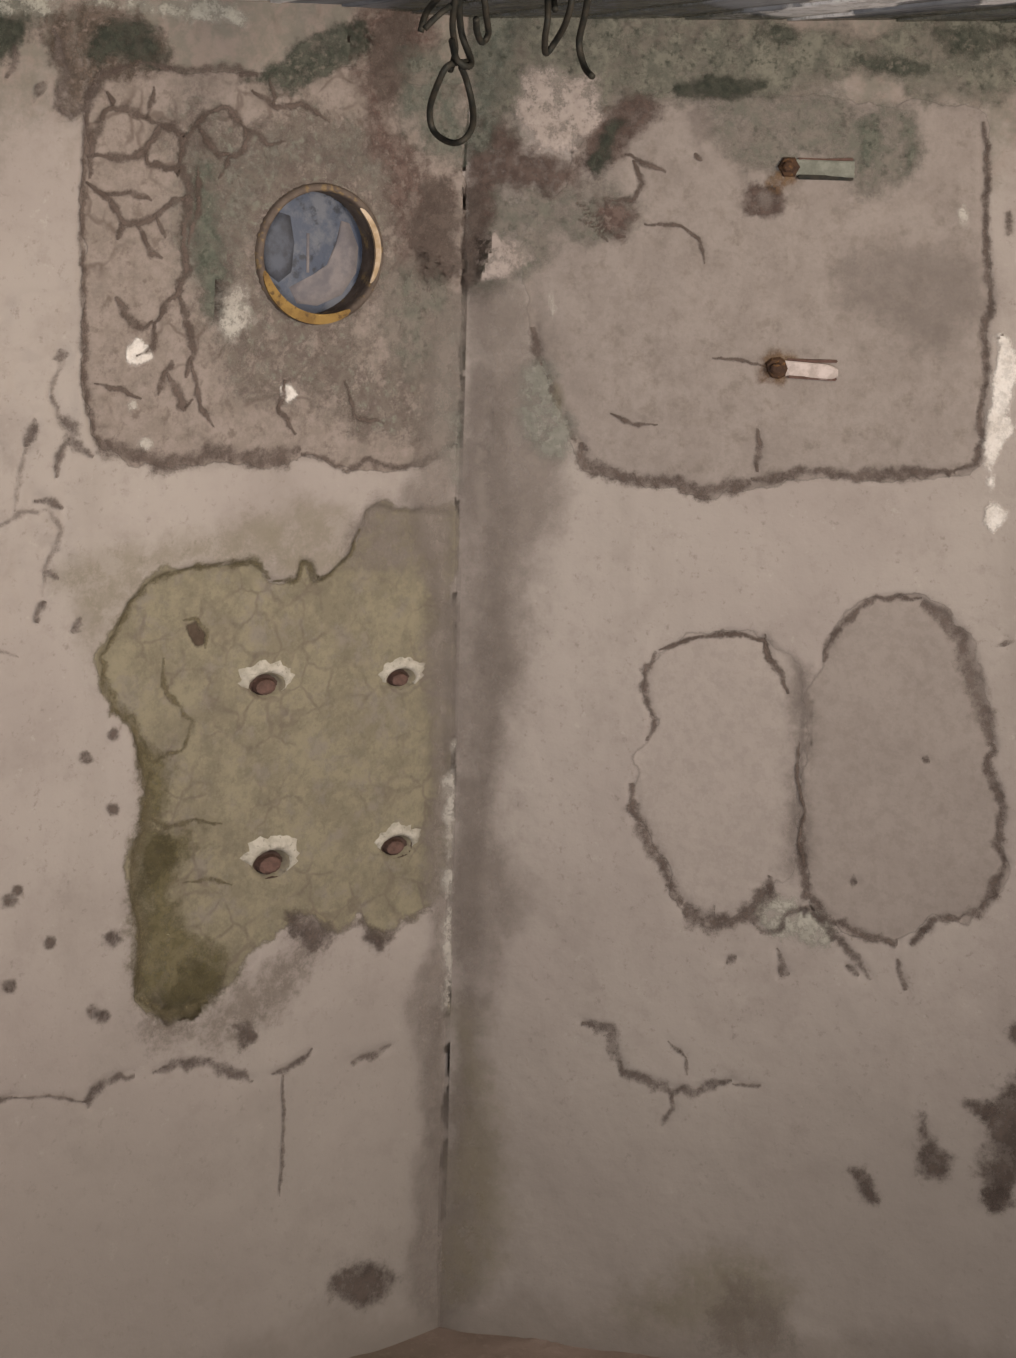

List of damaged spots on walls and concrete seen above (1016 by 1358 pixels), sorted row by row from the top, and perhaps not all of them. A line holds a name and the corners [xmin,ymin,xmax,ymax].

crack [6,28,327,435]
spalling [744,185,785,216]
crack [8,348,94,623]
leakage [160,0,1016,1150]
spalling [94,500,459,1021]
spalling [4,886,23,906]
spalling [753,897,867,977]
crack [0,1048,313,1193]
crack [581,1022,761,1122]
leakage [851,1169,878,1203]
leakage [966,1084,1016,1212]
leakage [330,1263,394,1306]